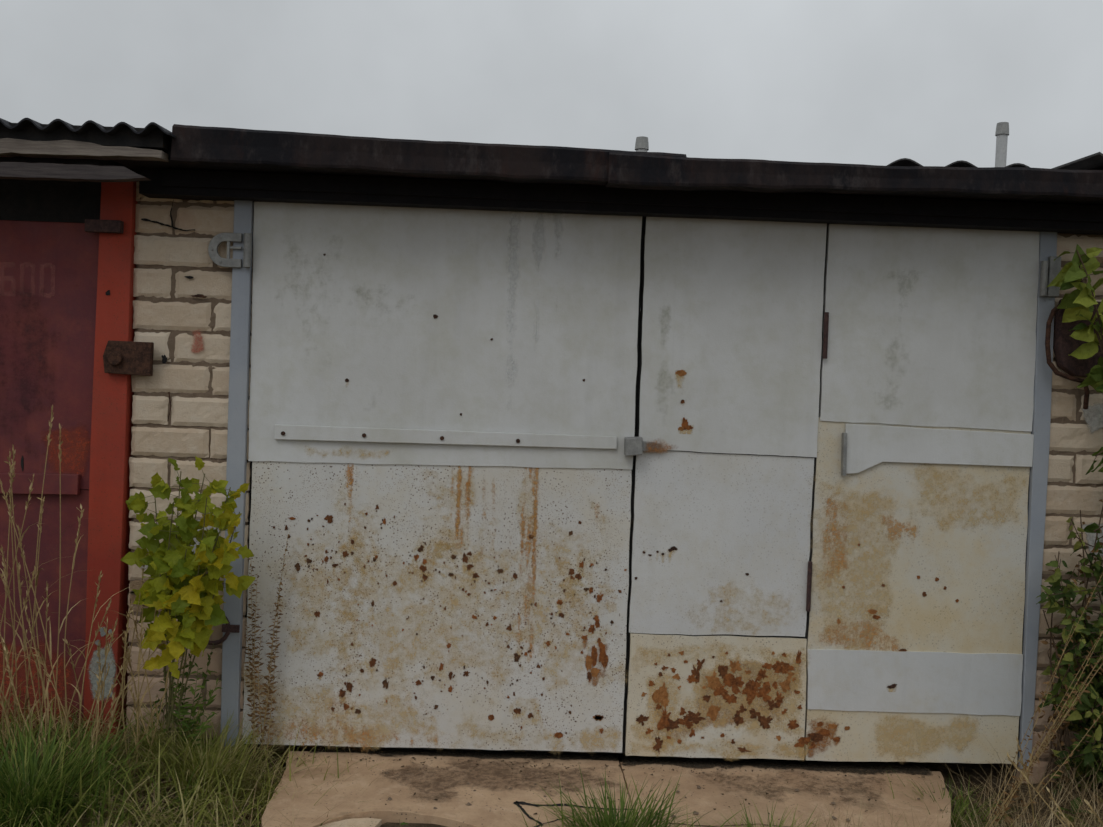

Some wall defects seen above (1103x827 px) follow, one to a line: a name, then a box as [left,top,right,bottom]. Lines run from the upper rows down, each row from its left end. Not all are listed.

corrosion [647,441,672,453]
corrosion [245,466,617,748]
corrosion [823,492,916,651]
corrosion [654,647,798,752]